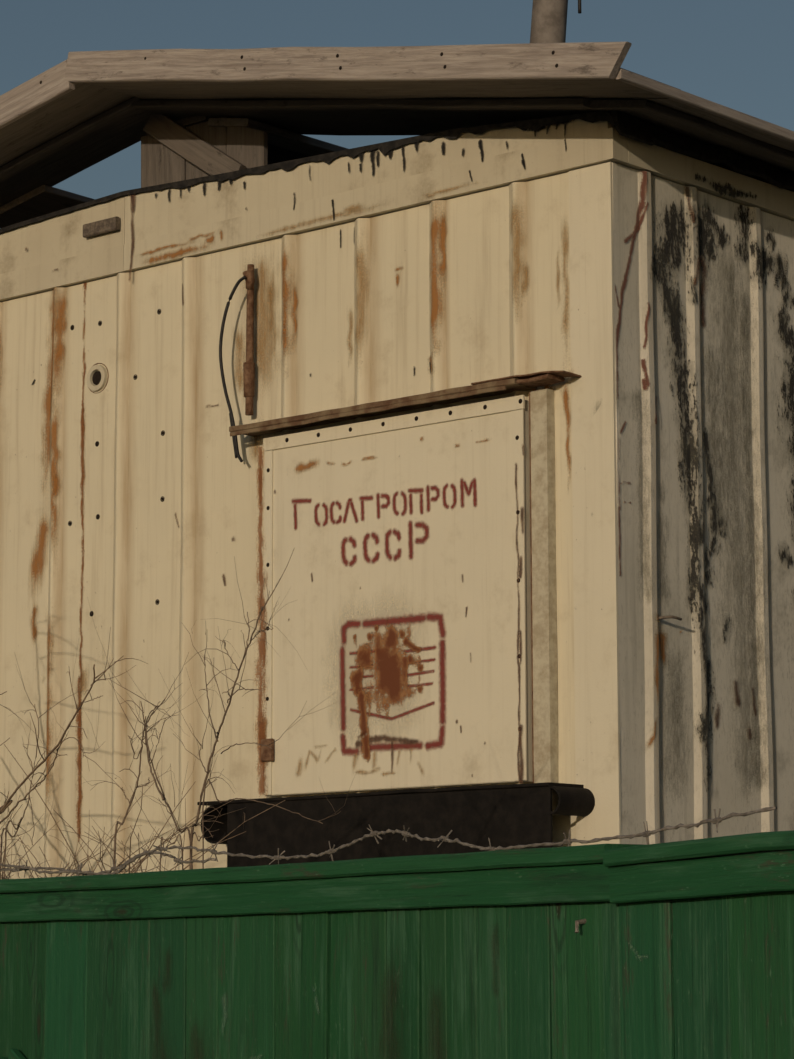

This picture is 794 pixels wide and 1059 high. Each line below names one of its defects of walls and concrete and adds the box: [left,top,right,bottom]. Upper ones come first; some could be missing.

corrosion [254,252,298,370]
corrosion [349,256,367,351]
corrosion [429,215,447,371]
corrosion [511,210,528,292]
corrosion [31,290,66,582]
damp [650,173,794,792]
corrosion [251,436,275,795]
corrosion [32,606,53,796]
corrosion [350,619,423,771]